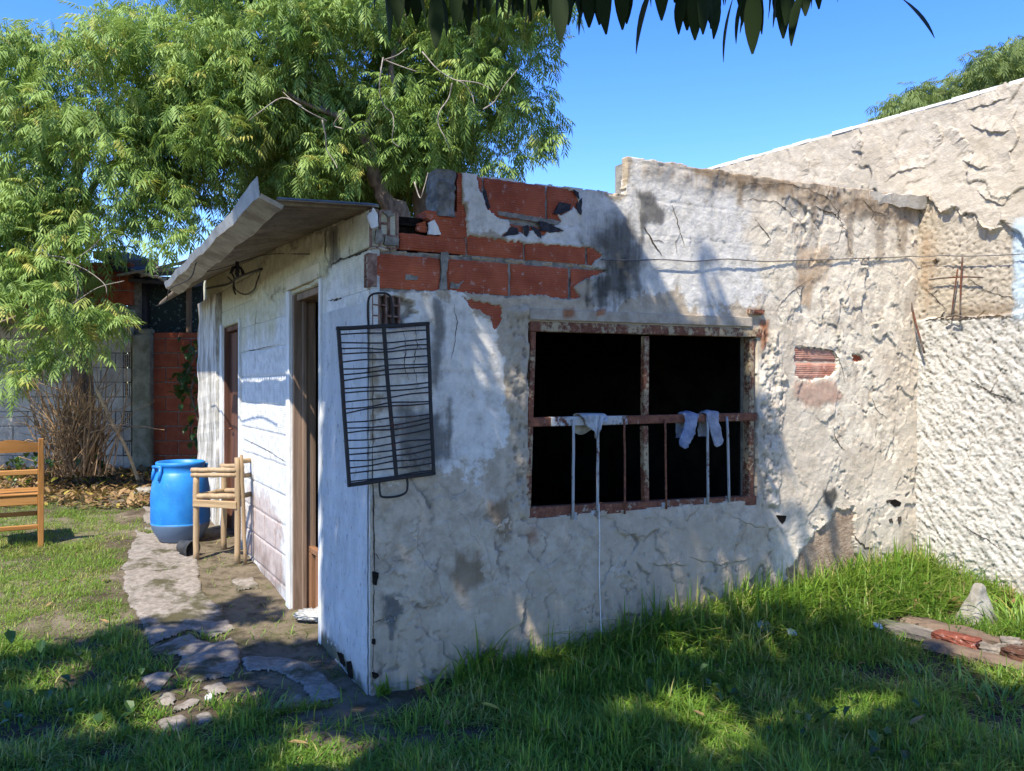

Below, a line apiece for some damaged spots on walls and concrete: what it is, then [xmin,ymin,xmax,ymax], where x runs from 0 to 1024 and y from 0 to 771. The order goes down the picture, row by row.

peeling [350,177,604,329]
crack [644,208,685,255]
crack [739,183,849,246]
peeling [793,347,841,404]
peeling [783,498,863,588]